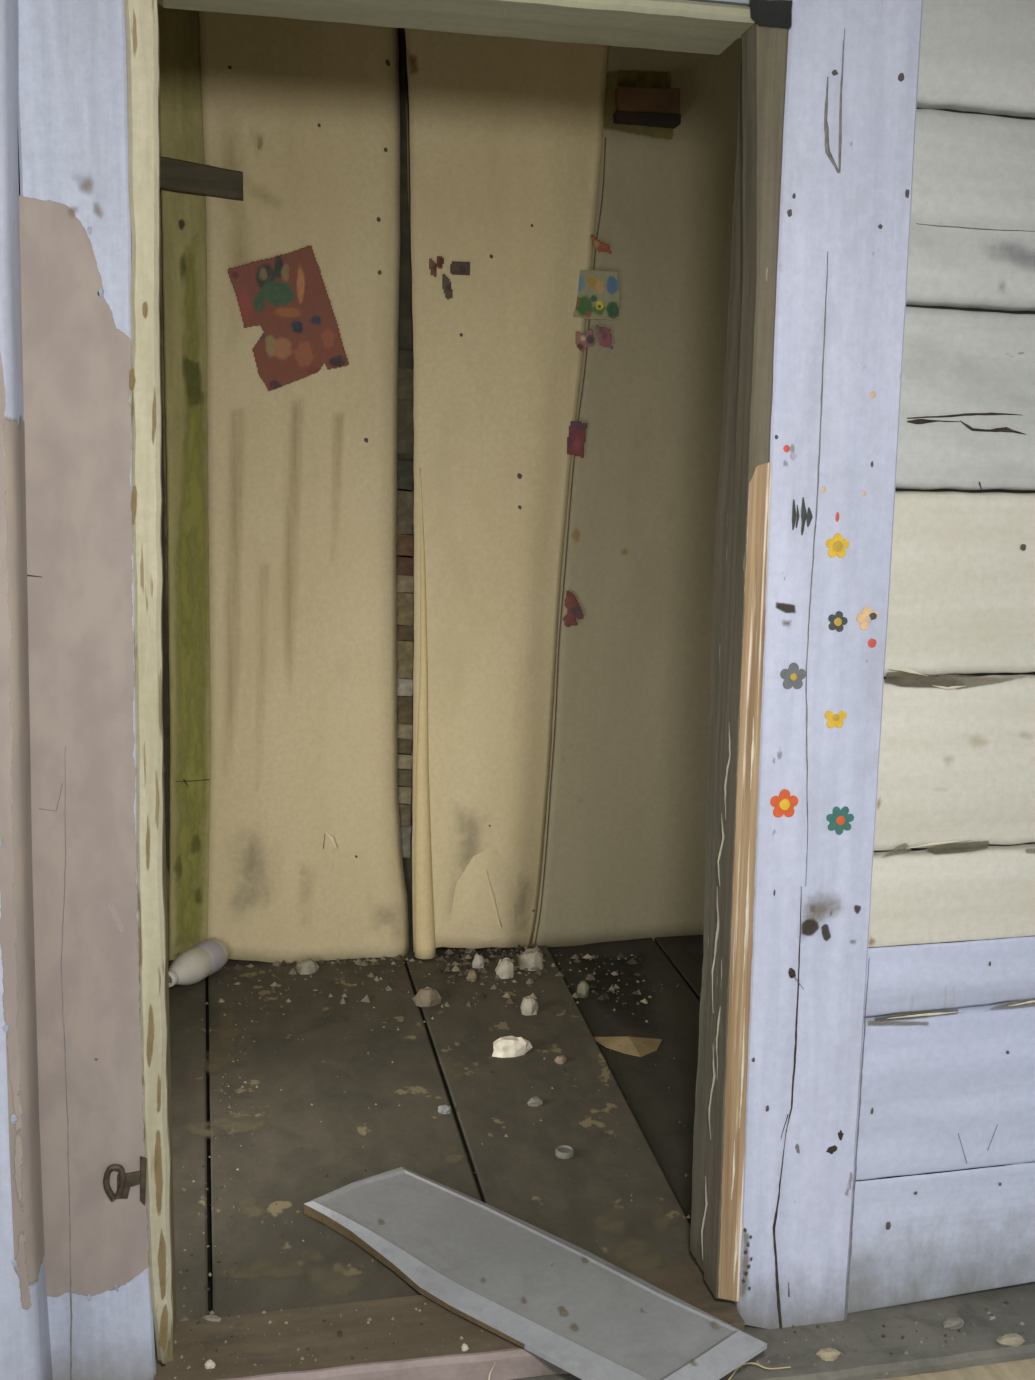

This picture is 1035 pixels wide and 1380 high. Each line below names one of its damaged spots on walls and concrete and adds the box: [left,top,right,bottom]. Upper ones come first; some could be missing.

peeling [0,196,170,1351]
damp [176,338,207,956]
crack [773,251,828,1329]
crack [907,412,1026,435]